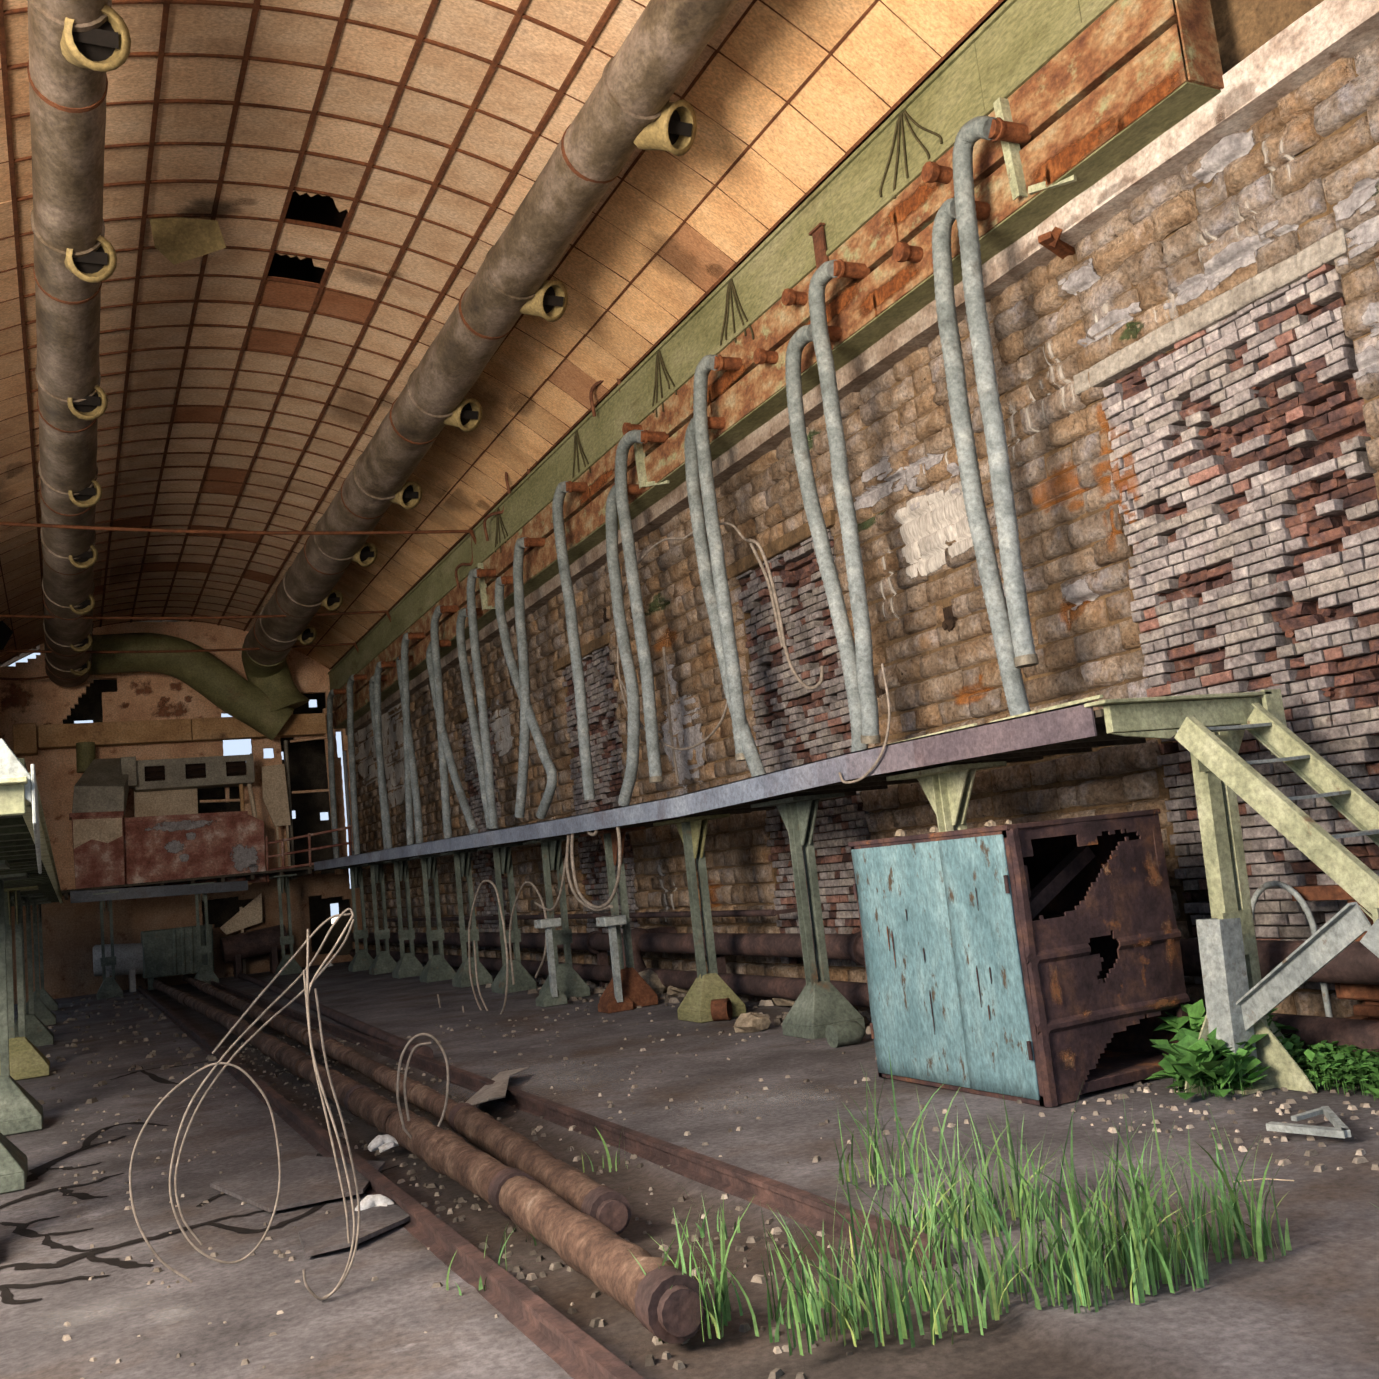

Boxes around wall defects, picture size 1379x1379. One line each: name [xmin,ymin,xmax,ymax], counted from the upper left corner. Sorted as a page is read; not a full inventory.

rust [1026,71,1179,194]
peeling [1192,130,1254,184]
rust [884,182,939,242]
peeling [1333,177,1379,266]
rust [807,266,918,325]
rust [707,364,746,415]
spalling [1171,297,1379,583]
spalling [1152,562,1238,606]
spalling [739,546,852,764]
spalling [1247,603,1379,709]
crack [110,1061,207,1084]
crack [0,1122,331,1304]